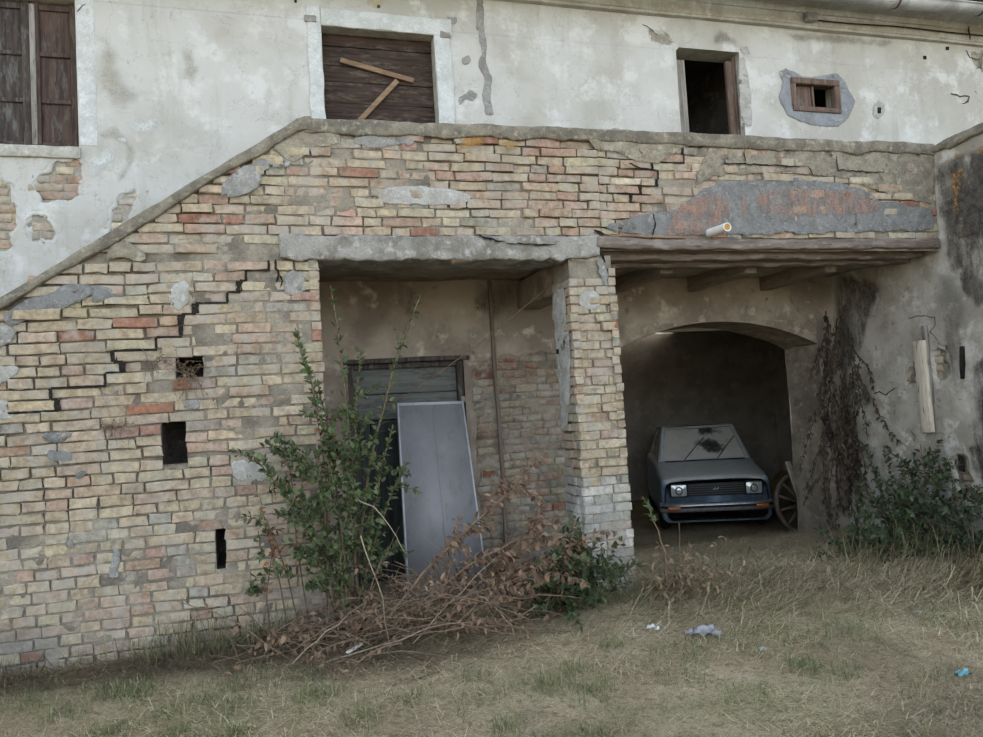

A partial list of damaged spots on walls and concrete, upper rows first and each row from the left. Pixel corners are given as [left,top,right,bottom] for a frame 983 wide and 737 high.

spalling [0,151,111,258]
peeling [94,186,149,233]
water stain [937,152,983,304]
water stain [969,442,983,480]